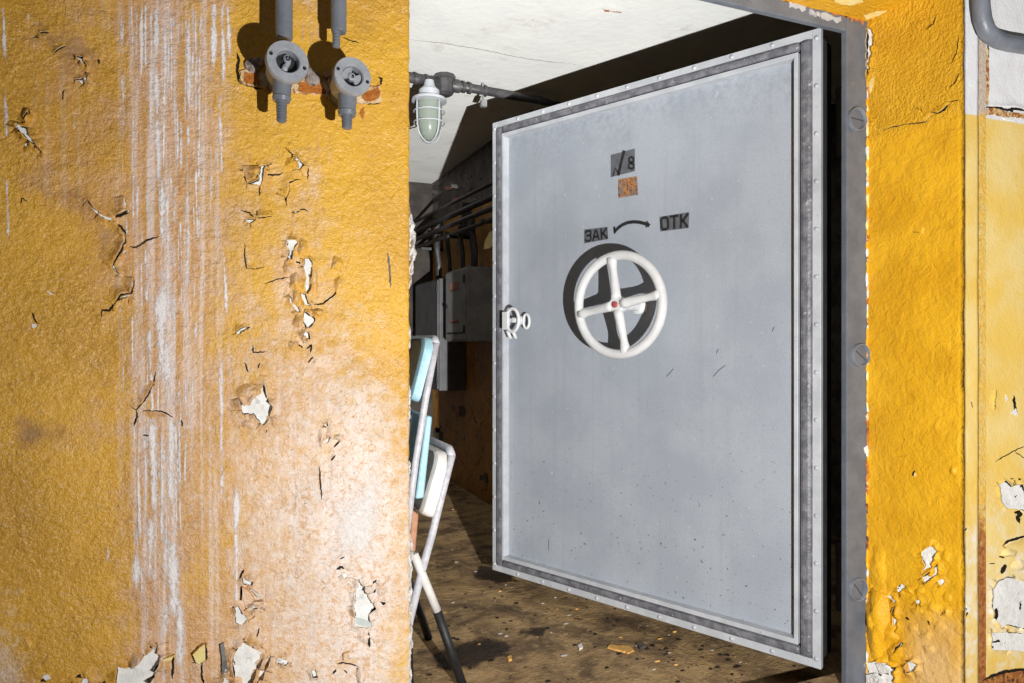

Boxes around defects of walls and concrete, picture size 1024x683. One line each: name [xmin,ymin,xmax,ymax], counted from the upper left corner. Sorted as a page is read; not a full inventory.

crack [869,36,960,132]
crack [64,193,160,318]
crack [130,373,183,436]
water stain [120,3,231,666]
peeling [228,347,283,433]
peeling [266,233,345,363]
spalling [785,0,887,603]
water stain [211,362,240,601]
peeling [193,570,293,683]
peeling [307,557,388,683]
peeling [864,539,952,683]
peeling [986,536,1024,656]